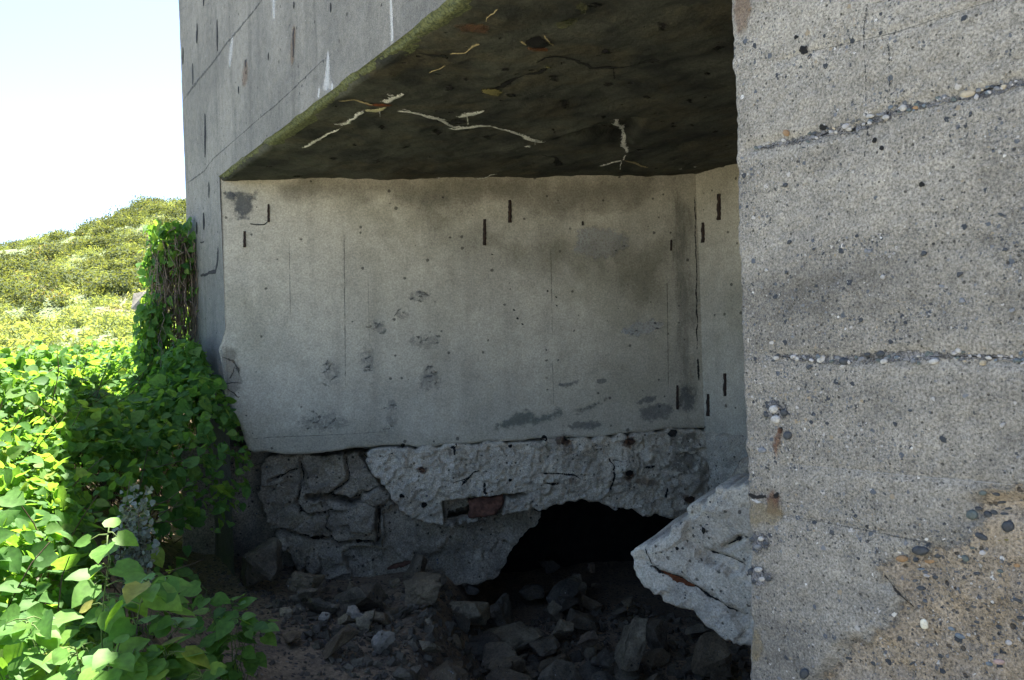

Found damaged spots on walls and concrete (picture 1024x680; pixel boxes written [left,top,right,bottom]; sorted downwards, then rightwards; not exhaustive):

crack [303,56,659,169]
water stain [226,192,253,219]
water stain [498,412,562,427]
corrosion [767,492,780,515]